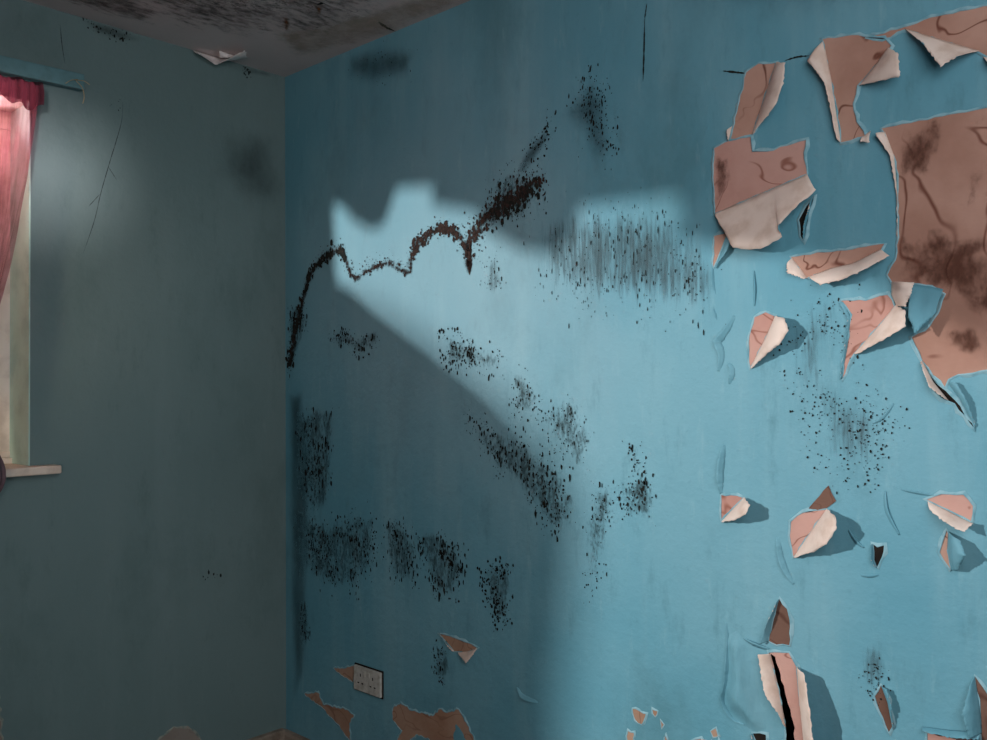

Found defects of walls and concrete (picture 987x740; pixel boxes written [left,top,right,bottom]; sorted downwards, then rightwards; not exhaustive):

water stain [285,64,620,381]
water stain [538,198,708,335]
water stain [773,284,863,356]
peeling [711,3,987,432]
water stain [293,407,514,631]
water stain [466,368,657,542]
peeling [719,492,750,523]
peeling [788,485,837,559]
water stain [779,368,910,493]
peeling [923,490,977,572]
peeling [758,596,813,740]
peeling [922,674,987,740]